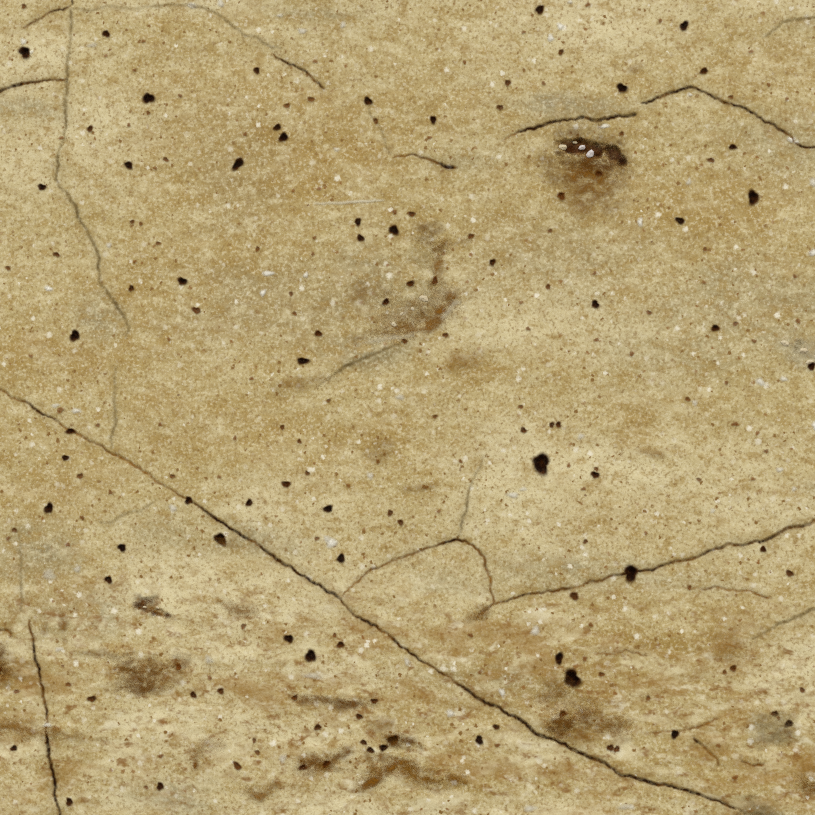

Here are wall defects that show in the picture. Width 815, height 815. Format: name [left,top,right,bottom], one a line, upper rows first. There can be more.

crack [25,0,73,33]
crack [219,15,324,89]
crack [508,86,815,148]
crack [0,59,129,330]
crack [394,154,456,169]
crack [1,391,815,815]